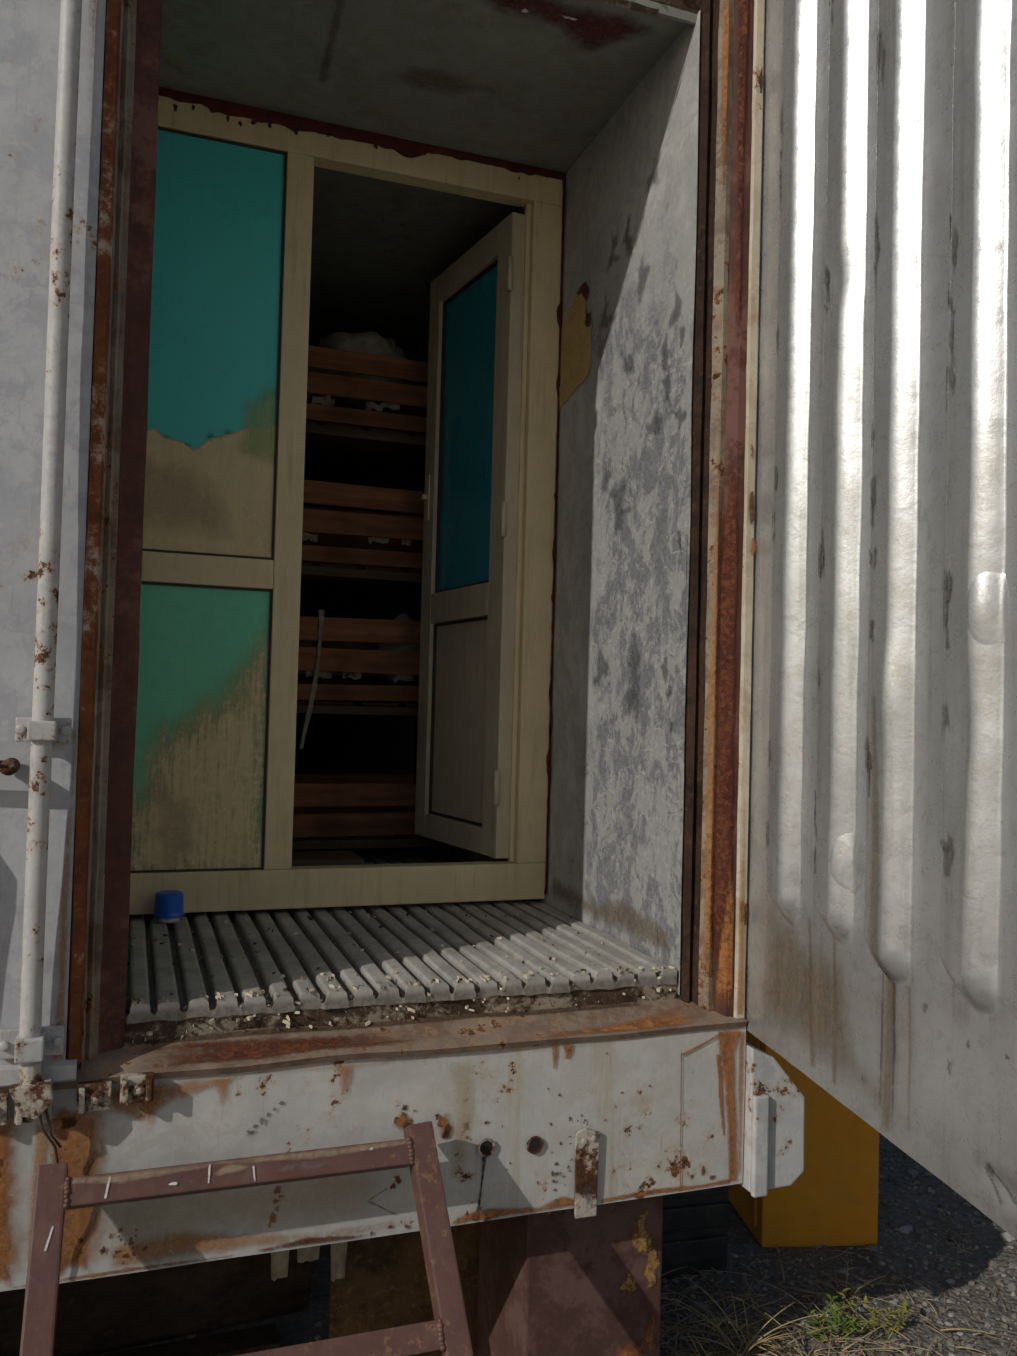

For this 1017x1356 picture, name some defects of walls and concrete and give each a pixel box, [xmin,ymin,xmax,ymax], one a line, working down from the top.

corrosion [722,1,730,182]
peeling [559,281,592,408]
peeling [143,395,278,561]
peeling [131,636,271,873]
corrosion [704,466,737,998]
corrosion [0,1126,14,1280]
corrosion [30,1111,100,1235]
corrosion [60,1207,188,1280]
corrosion [260,1235,362,1251]
corrosion [454,1115,588,1223]
corrosion [602,1030,769,1202]